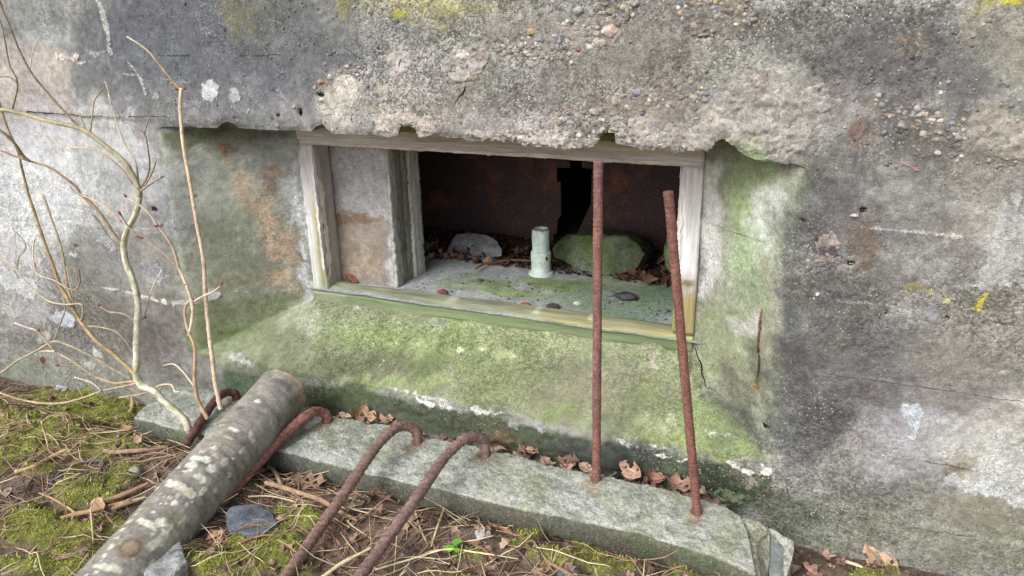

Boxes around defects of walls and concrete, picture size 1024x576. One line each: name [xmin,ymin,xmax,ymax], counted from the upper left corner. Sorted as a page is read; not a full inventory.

spalling [311,50,722,515]
damp [230,353,254,367]
damp [480,348,517,361]
crack [694,347,725,399]
damp [389,386,521,430]